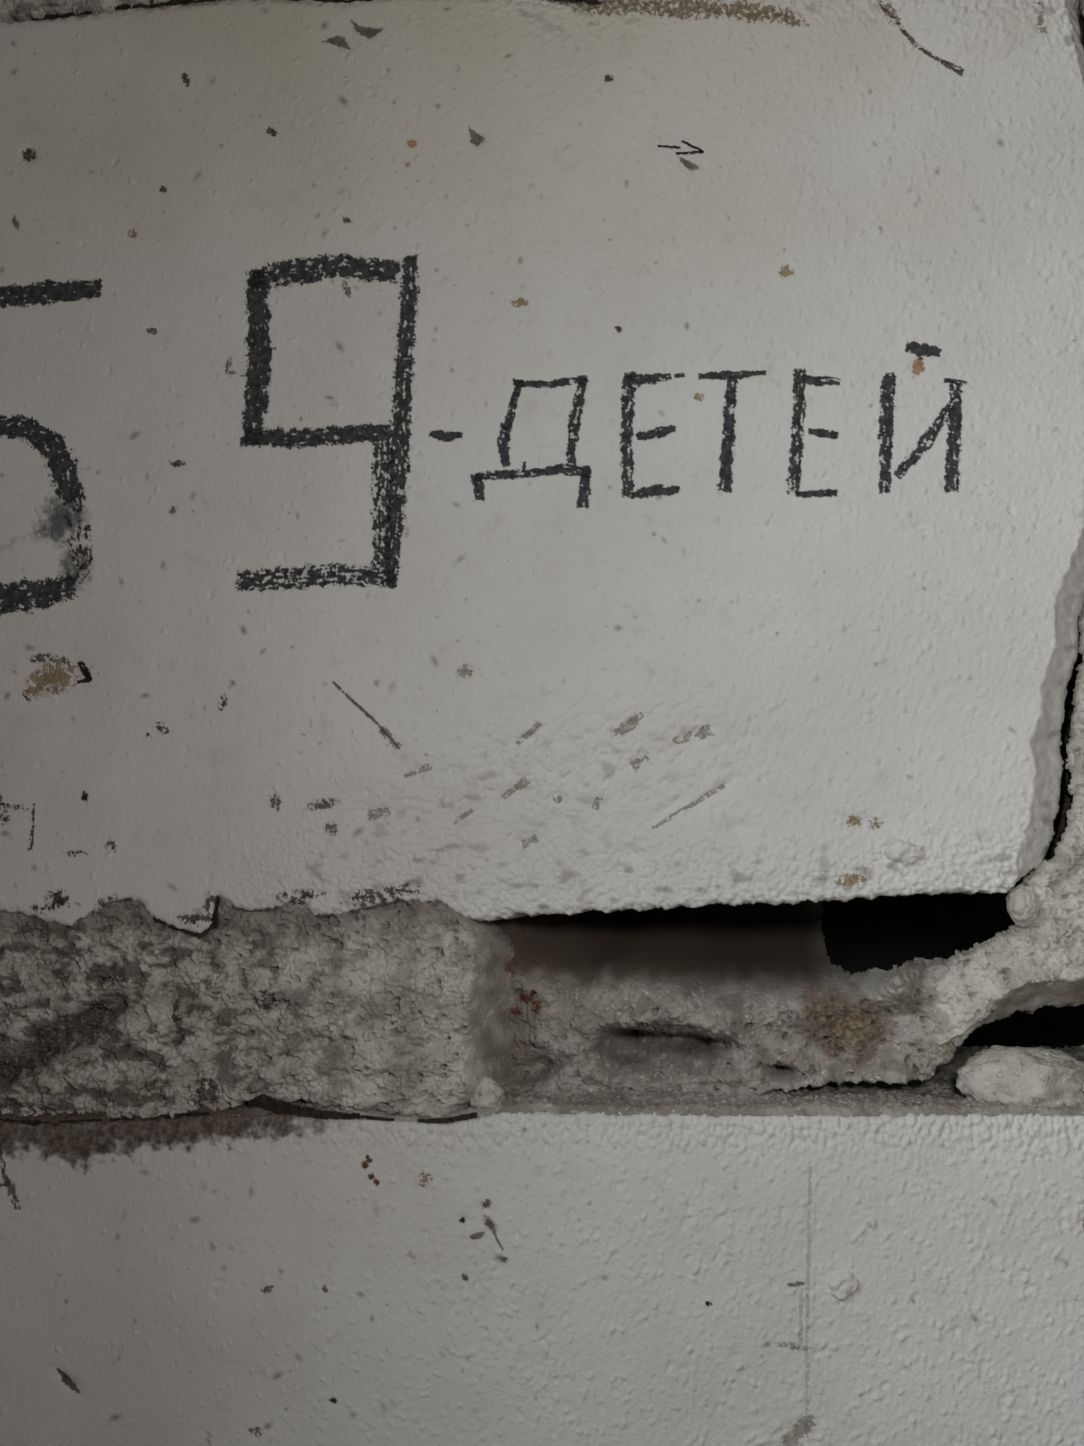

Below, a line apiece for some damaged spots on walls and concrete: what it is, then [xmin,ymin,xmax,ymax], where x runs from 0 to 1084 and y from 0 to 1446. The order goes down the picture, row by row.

crack [1076,14,1084,44]
crack [1047,656,1083,861]
spalling [493,899,998,1097]